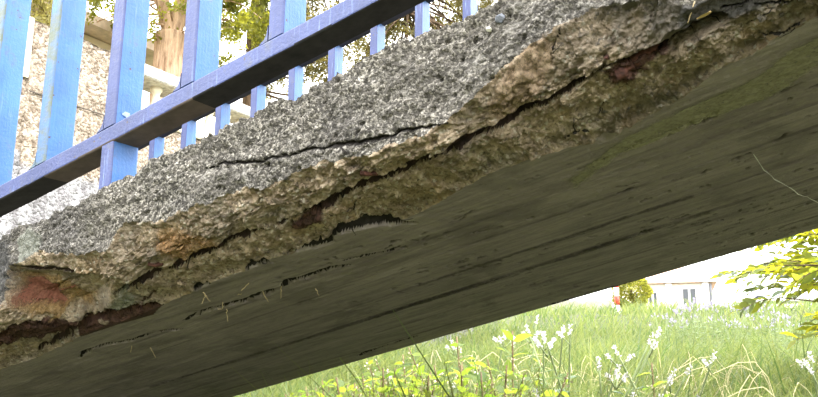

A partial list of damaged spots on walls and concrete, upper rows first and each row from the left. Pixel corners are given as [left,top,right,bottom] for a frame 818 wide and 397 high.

spalling [399,0,818,191]
crack [12,265,74,273]
rust [0,271,164,346]
spalling [0,142,456,369]
crack [38,60,618,357]